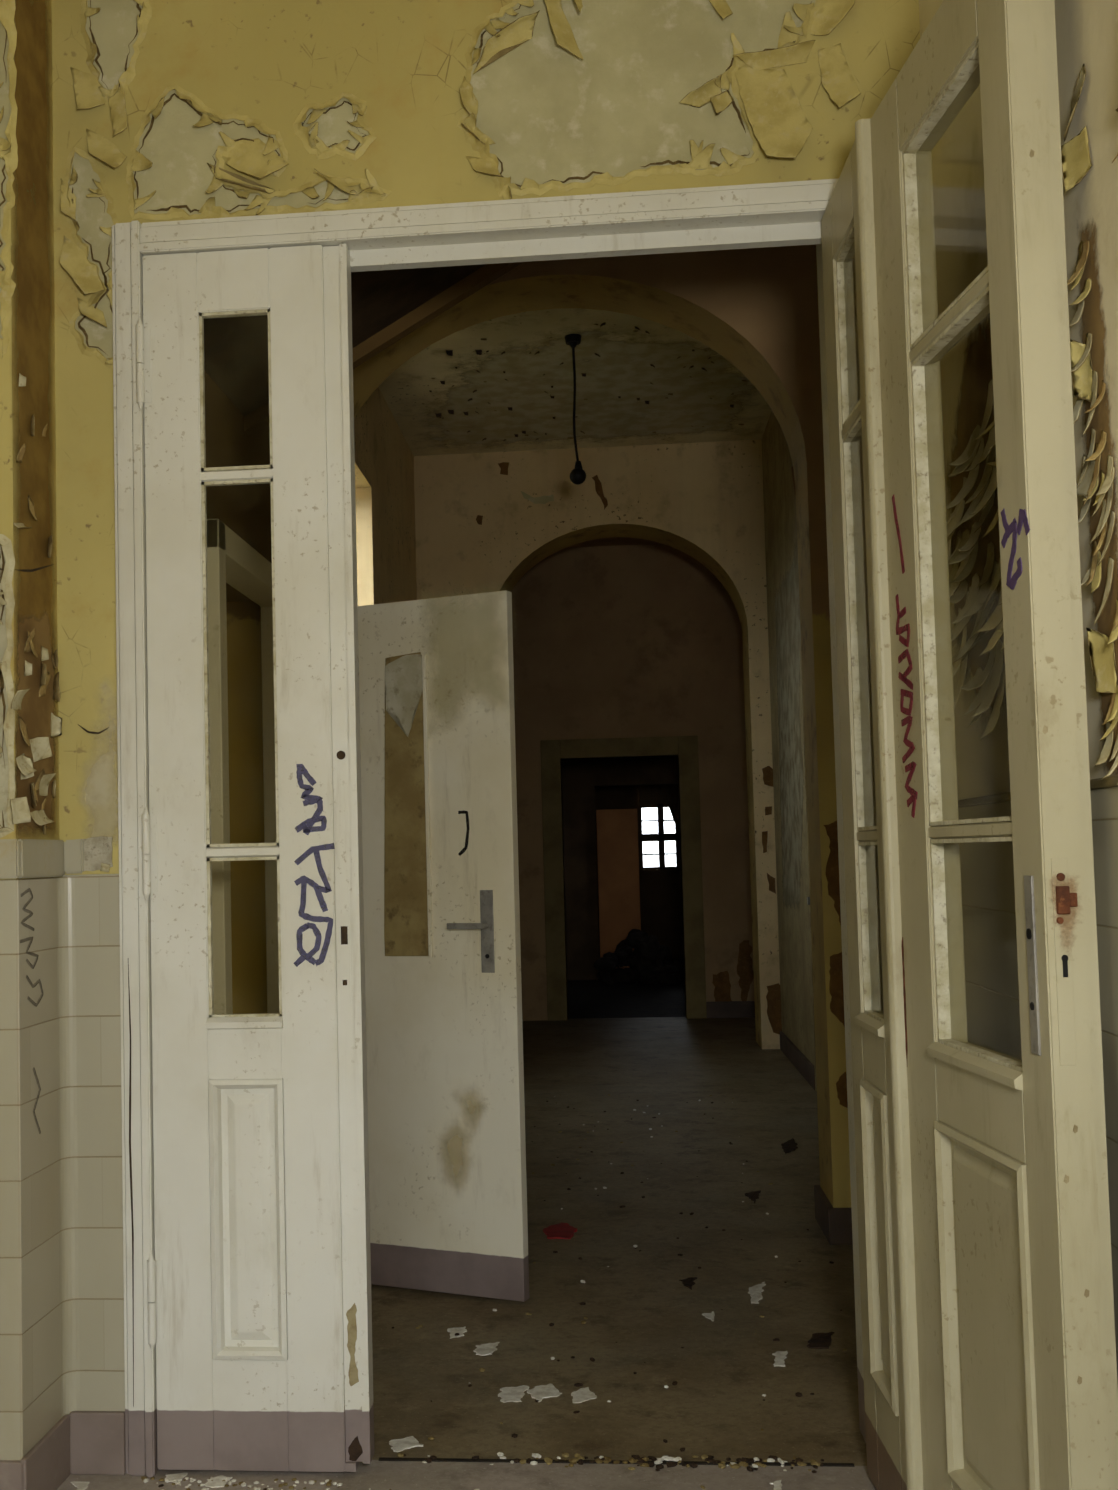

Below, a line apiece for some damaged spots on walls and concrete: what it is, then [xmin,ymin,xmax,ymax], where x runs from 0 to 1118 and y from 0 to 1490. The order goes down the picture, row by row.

peeling [0,0,18,358]
peeling [59,0,392,369]
peeling [457,0,861,200]
peeling [1061,64,1092,192]
peeling [1067,224,1118,786]
flaking render [0,495,62,838]
spalling [824,821,841,925]
spalling [829,952,845,1027]
spalling [836,1072,848,1108]